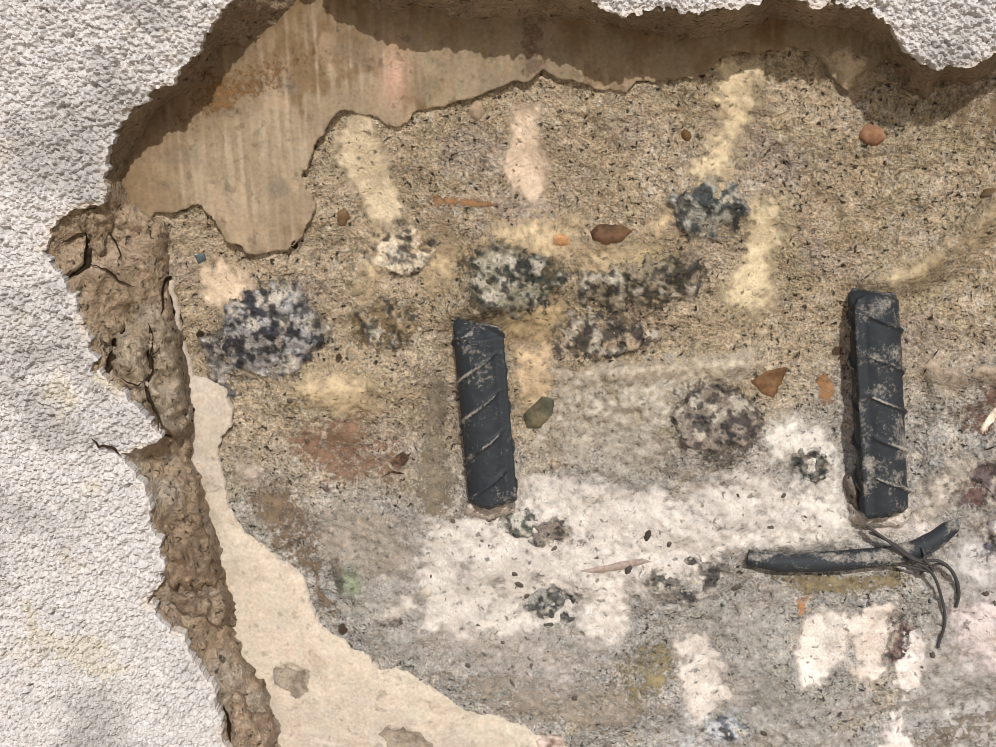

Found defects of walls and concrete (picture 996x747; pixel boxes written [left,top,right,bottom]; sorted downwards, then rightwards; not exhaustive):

crack [61,232,135,287]
spalling [162,279,175,322]
crack [105,255,186,438]
spalling [125,401,223,560]
spalling [549,528,589,559]
spalling [764,531,838,552]
spalling [835,497,891,551]
spalling [488,572,535,620]
spalling [981,574,996,606]
spalling [149,573,281,742]
flaking render [273,666,310,699]
flaking render [379,726,433,747]